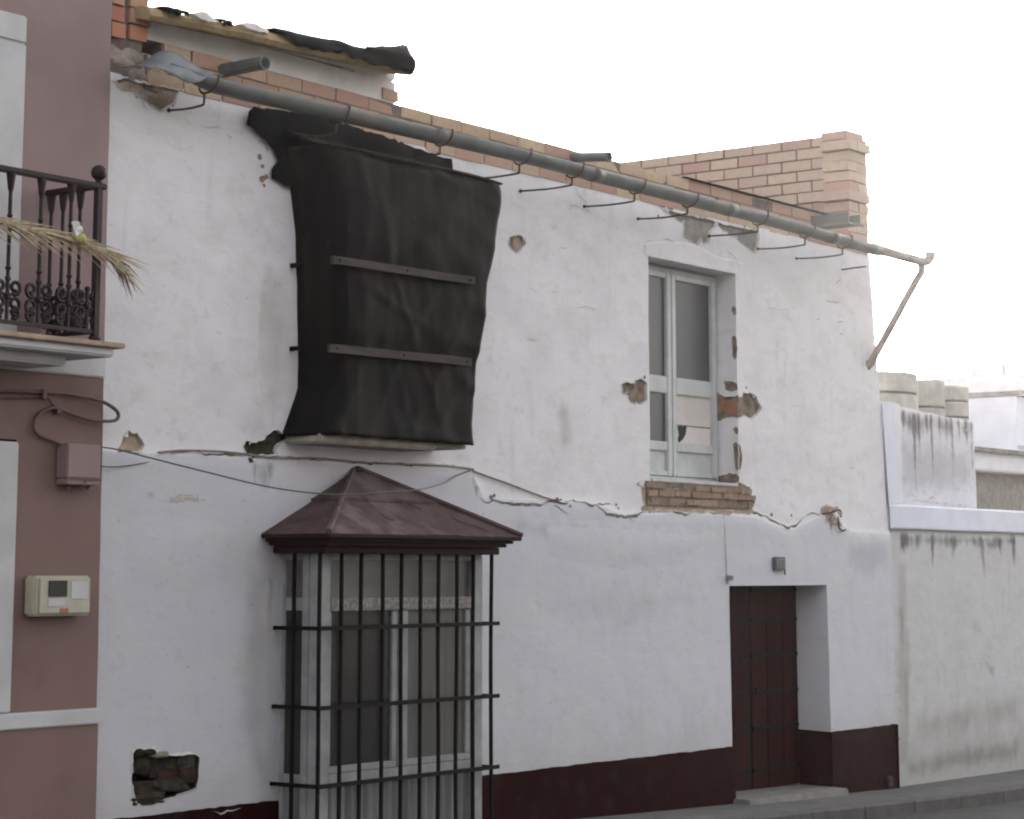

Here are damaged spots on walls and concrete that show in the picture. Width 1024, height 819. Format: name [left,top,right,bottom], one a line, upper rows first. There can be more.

spalling [111,76,181,112]
spalling [508,234,526,253]
spalling [658,206,760,254]
spalling [621,376,648,404]
spalling [117,430,145,454]
spalling [242,429,287,463]
spalling [640,381,762,516]
water stain [902,413,972,455]
crack [481,493,818,529]
water stain [901,536,954,556]
spalling [130,746,201,807]